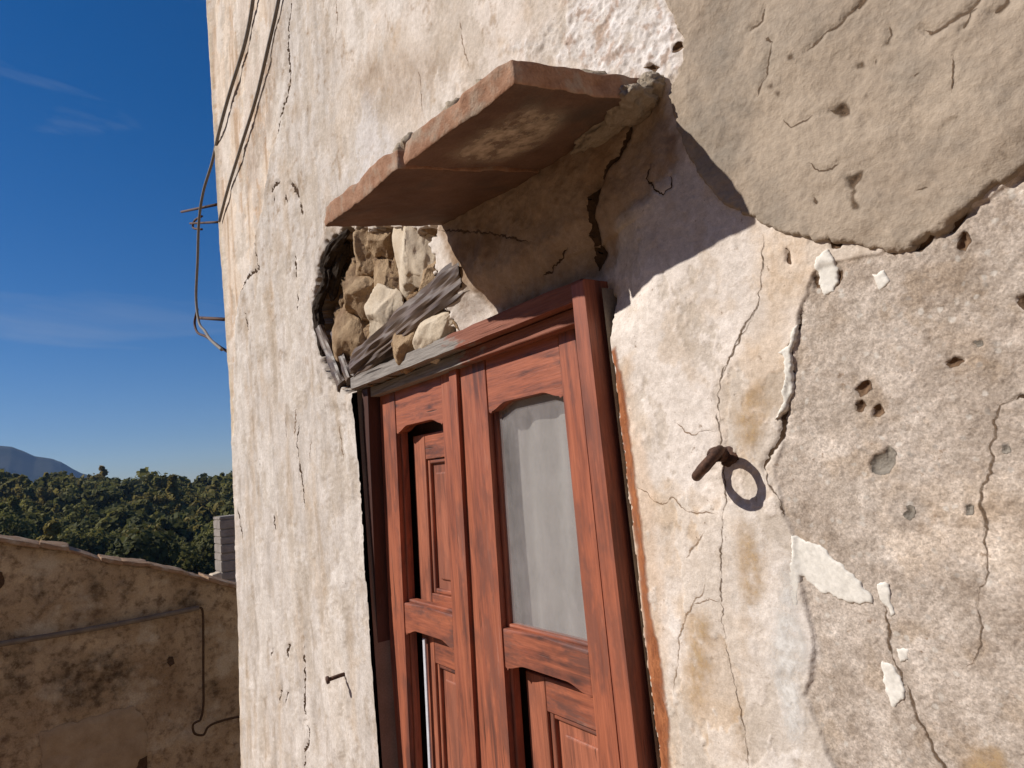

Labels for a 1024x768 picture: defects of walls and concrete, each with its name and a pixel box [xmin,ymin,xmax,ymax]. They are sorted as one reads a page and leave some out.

crack [278,3,292,133]
crack [586,127,633,271]
flaking render [312,228,357,358]
flaking render [372,257,419,303]
crack [637,236,764,767]
crack [764,412,788,517]
flaking render [789,535,895,616]
hole [854,380,885,417]
hole [871,445,896,475]
crack [966,394,1024,667]
flaking render [881,648,909,707]
crack [885,607,946,768]